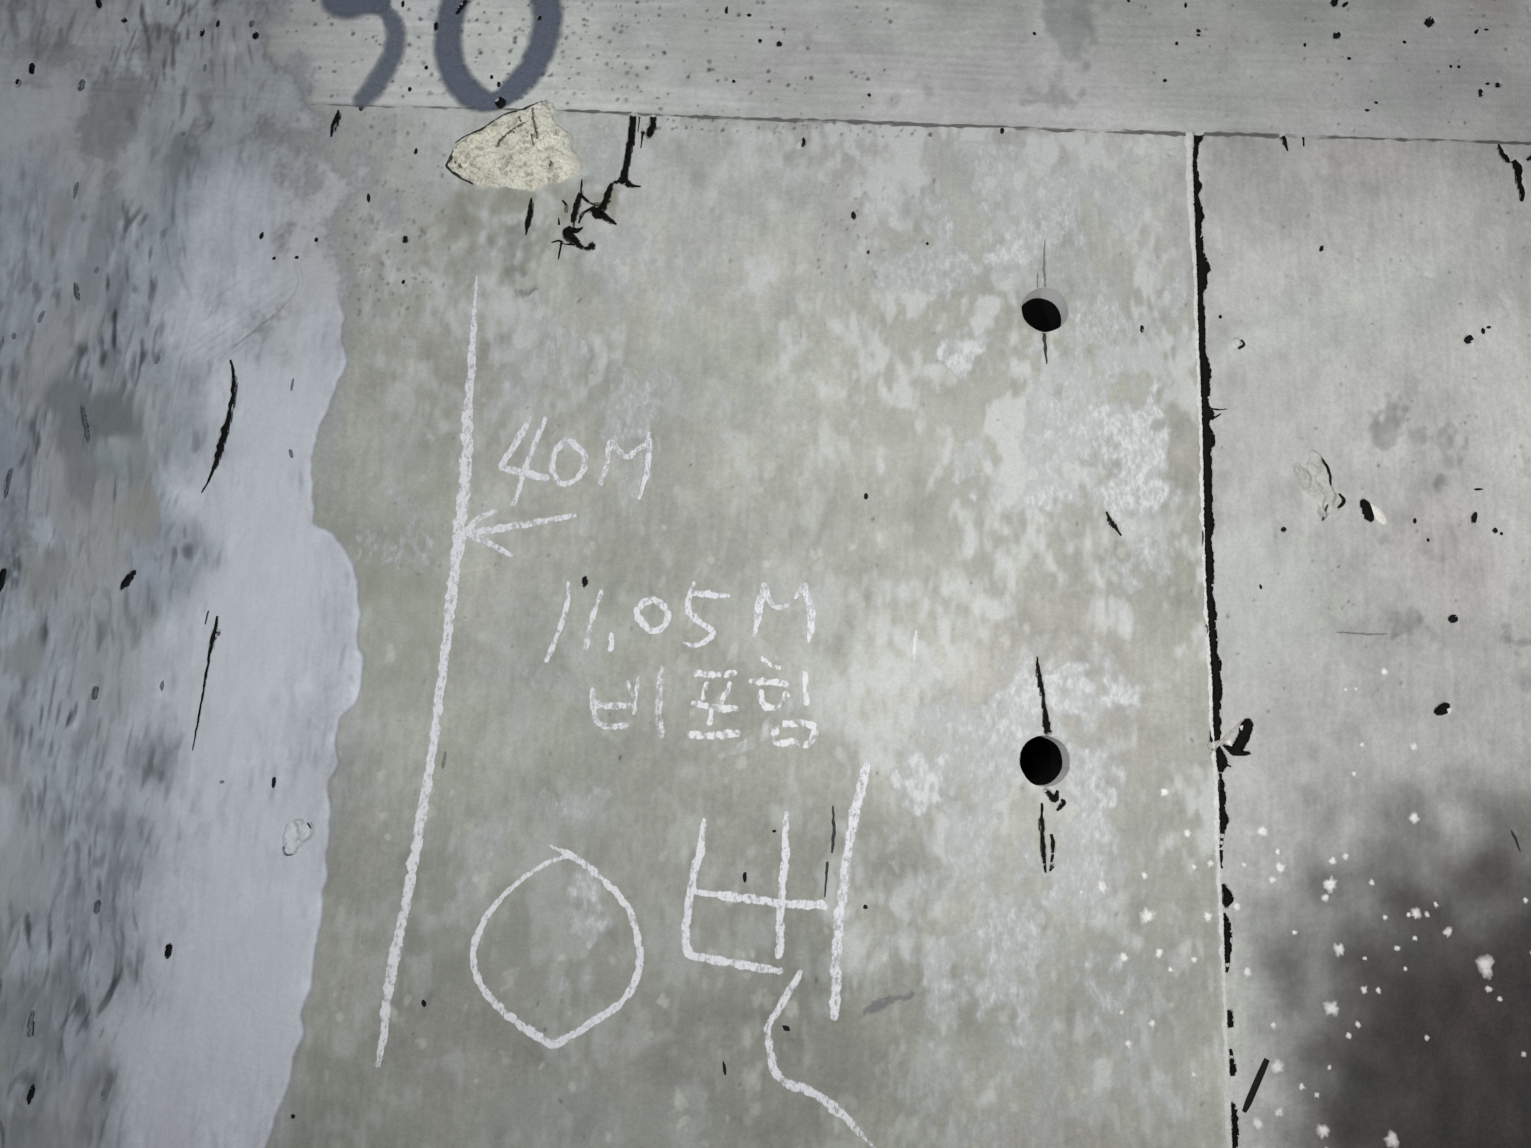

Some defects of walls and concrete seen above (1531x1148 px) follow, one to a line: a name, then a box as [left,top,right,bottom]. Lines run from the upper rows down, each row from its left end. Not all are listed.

crack [430,101,1075,259]
crack [1037,239,1046,287]
crack [1041,333,1049,364]
crack [201,360,236,493]
crack [1106,512,1122,536]
crack [1111,130,1531,1148]
crack [1036,657,1051,733]
crack [824,805,836,897]
crack [1040,790,1066,873]
damp [1307,844,1531,1148]